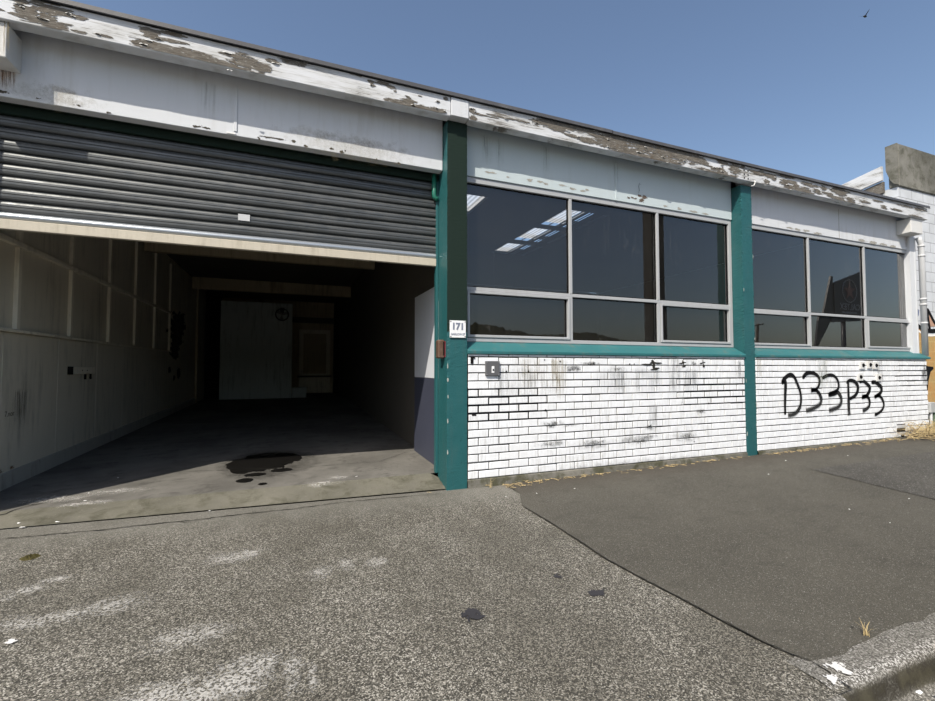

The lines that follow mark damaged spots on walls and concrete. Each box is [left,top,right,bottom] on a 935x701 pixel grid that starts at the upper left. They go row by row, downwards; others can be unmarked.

peeling [0,0,112,38]
peeling [128,26,307,74]
peeling [469,108,928,219]